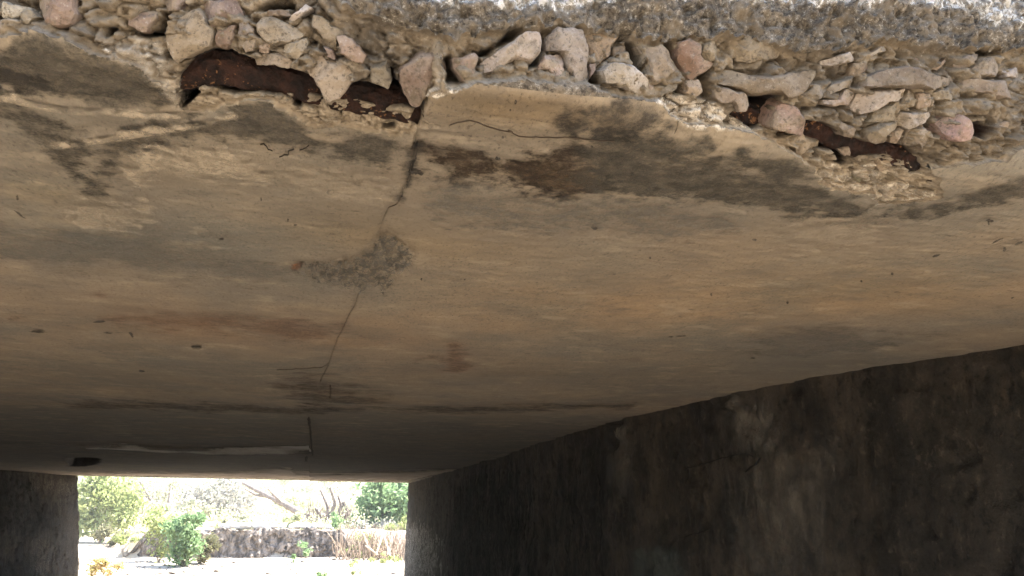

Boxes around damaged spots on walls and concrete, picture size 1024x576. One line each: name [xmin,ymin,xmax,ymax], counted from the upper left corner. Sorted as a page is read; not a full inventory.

water stain [0,33,395,277]
spalling [0,0,460,138]
crack [449,120,615,142]
peeling [492,0,592,11]
water stain [395,96,1024,244]
spalling [631,30,1024,205]
peeling [926,0,1024,30]